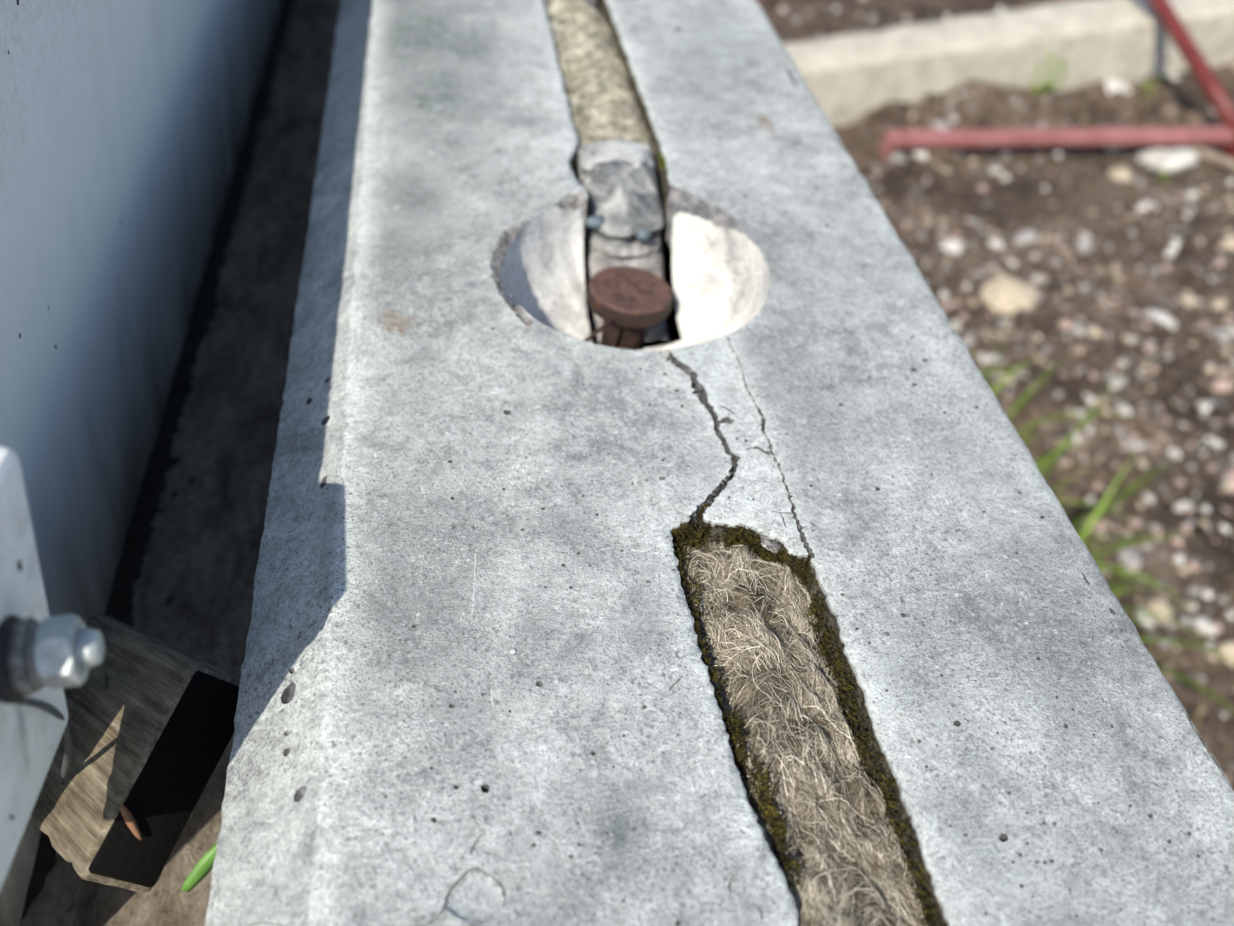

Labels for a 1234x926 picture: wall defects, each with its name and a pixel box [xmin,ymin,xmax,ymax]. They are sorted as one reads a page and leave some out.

crack [660,336,815,562]